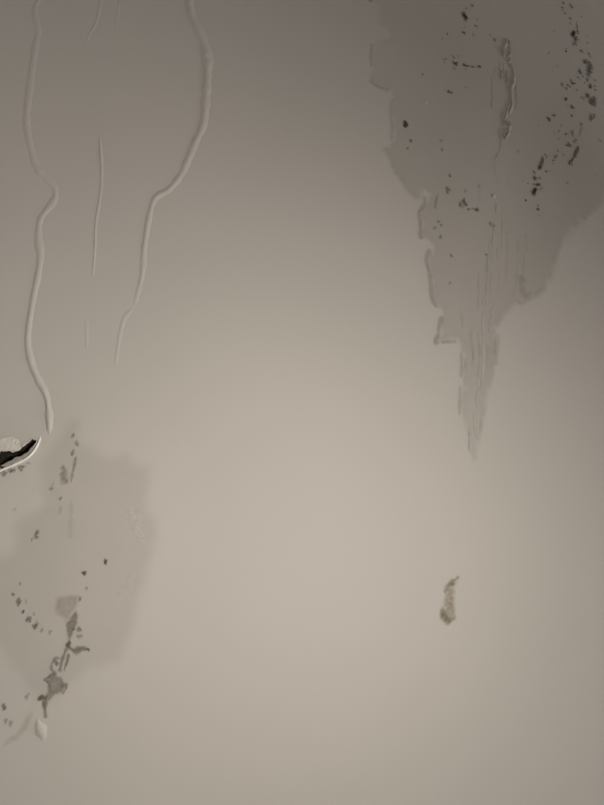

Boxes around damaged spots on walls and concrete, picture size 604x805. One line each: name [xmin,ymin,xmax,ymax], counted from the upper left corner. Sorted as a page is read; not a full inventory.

mould [561,53,596,120]
spalling [0,436,41,476]
damp [35,613,90,743]